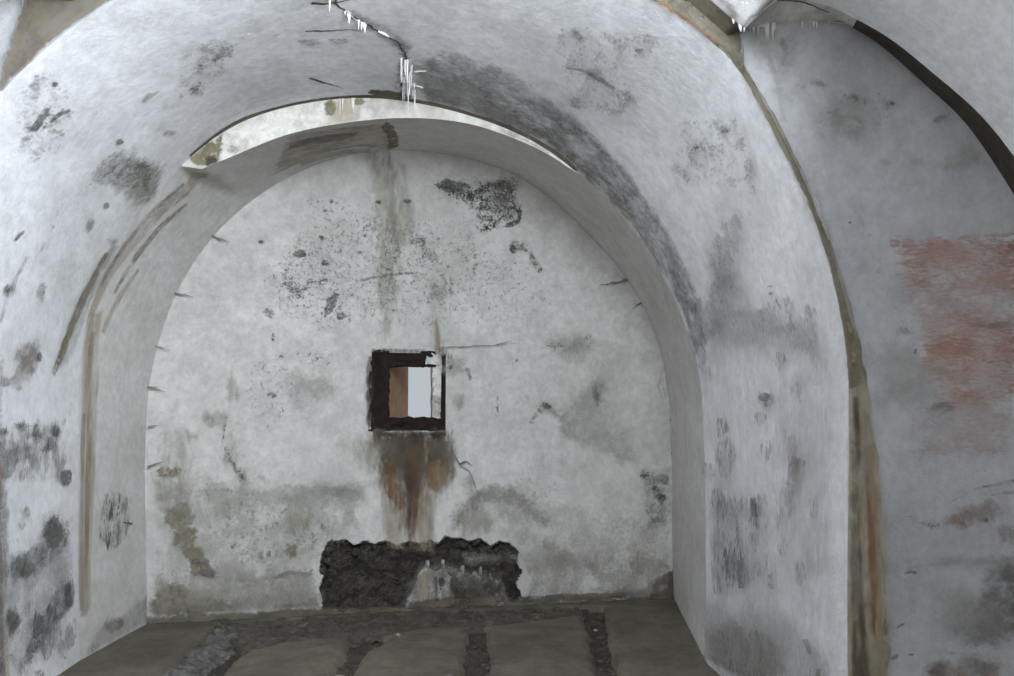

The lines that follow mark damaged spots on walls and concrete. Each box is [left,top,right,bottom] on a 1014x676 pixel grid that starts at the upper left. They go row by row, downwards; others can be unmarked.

crack [305,0,407,96]
damp [25,109,70,141]
damp [95,139,157,187]
damp [278,55,658,223]
damp [436,178,522,245]
damp [274,200,534,332]
damp [670,245,743,348]
rust [373,429,453,541]
mould [0,422,75,676]
damp [209,505,333,589]
damp [147,563,674,624]
damp [711,489,760,592]